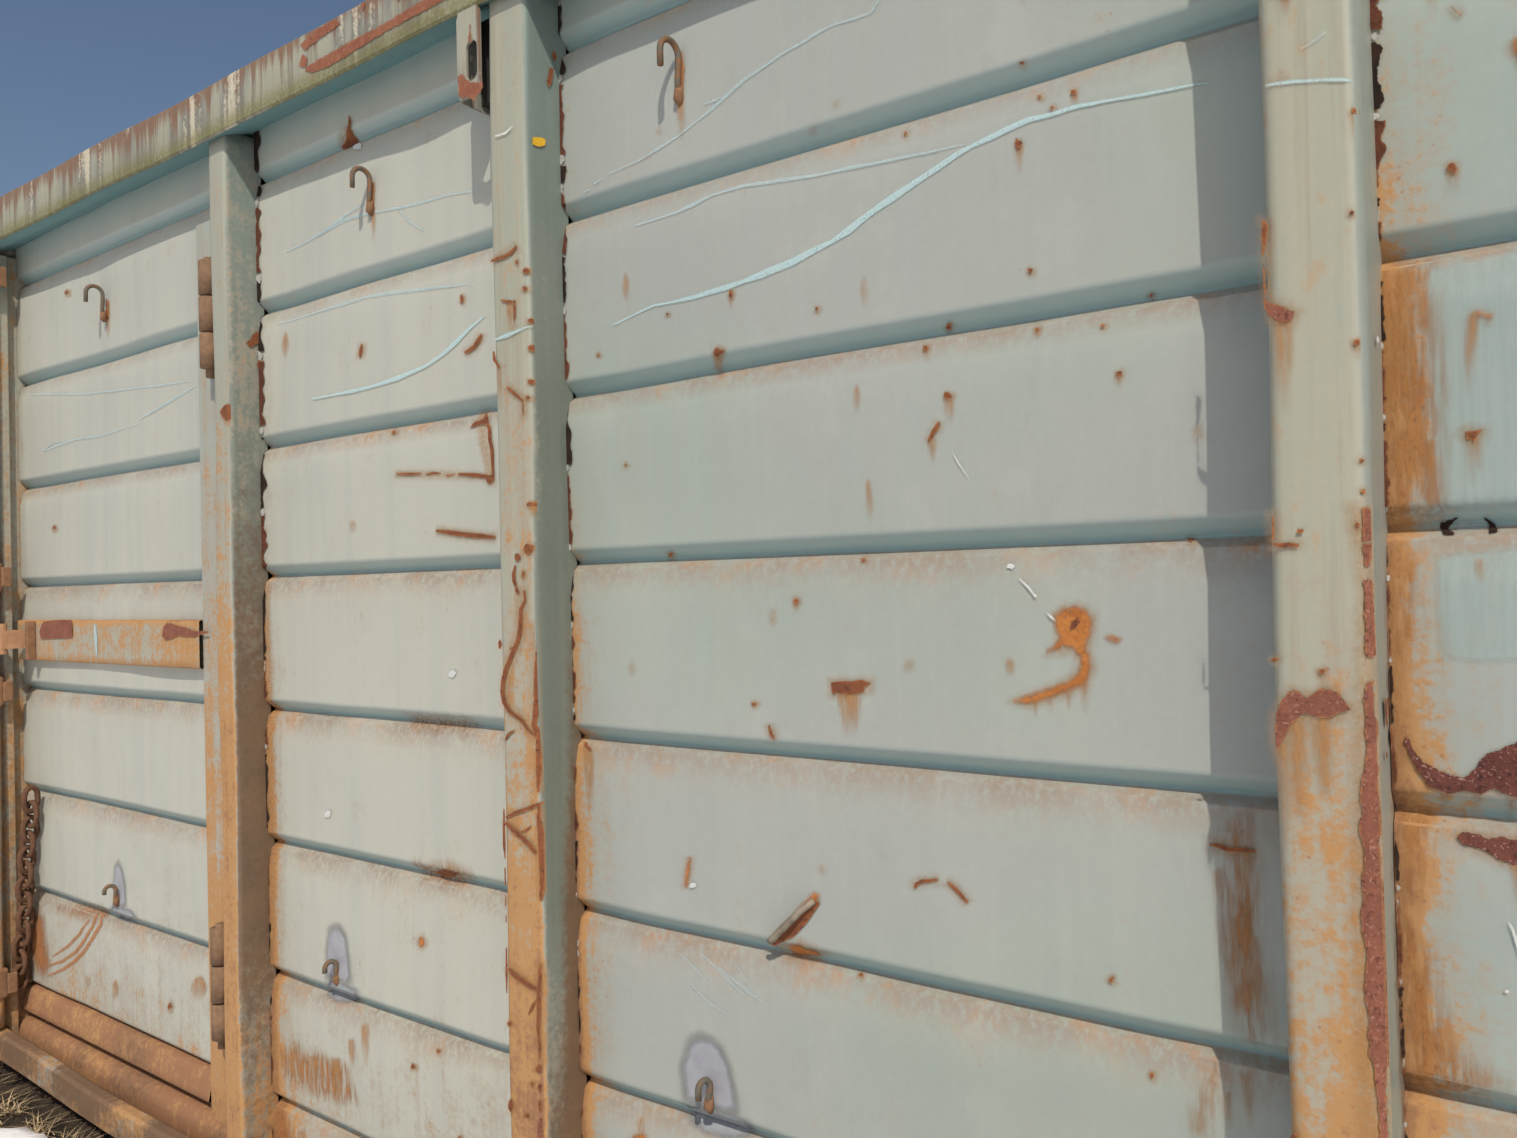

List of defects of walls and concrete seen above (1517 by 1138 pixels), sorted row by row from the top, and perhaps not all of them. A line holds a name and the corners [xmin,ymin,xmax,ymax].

rust [1383,266,1437,510]
rust [1015,607,1119,703]
rust [1404,738,1517,797]
rust [1457,832,1517,865]
rust [771,893,820,956]
rust [285,1027,366,1098]